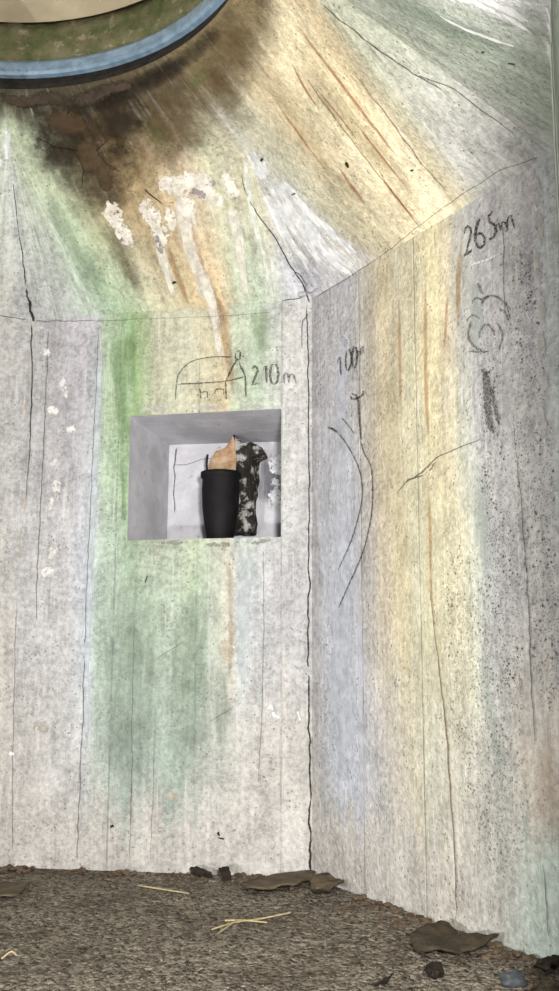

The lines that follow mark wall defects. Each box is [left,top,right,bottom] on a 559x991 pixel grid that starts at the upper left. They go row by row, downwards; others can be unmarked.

crack [325,6,513,133]
leakage [156,233,174,294]
leakage [176,197,221,363]
crack [0,77,536,870]
crack [542,870,550,937]